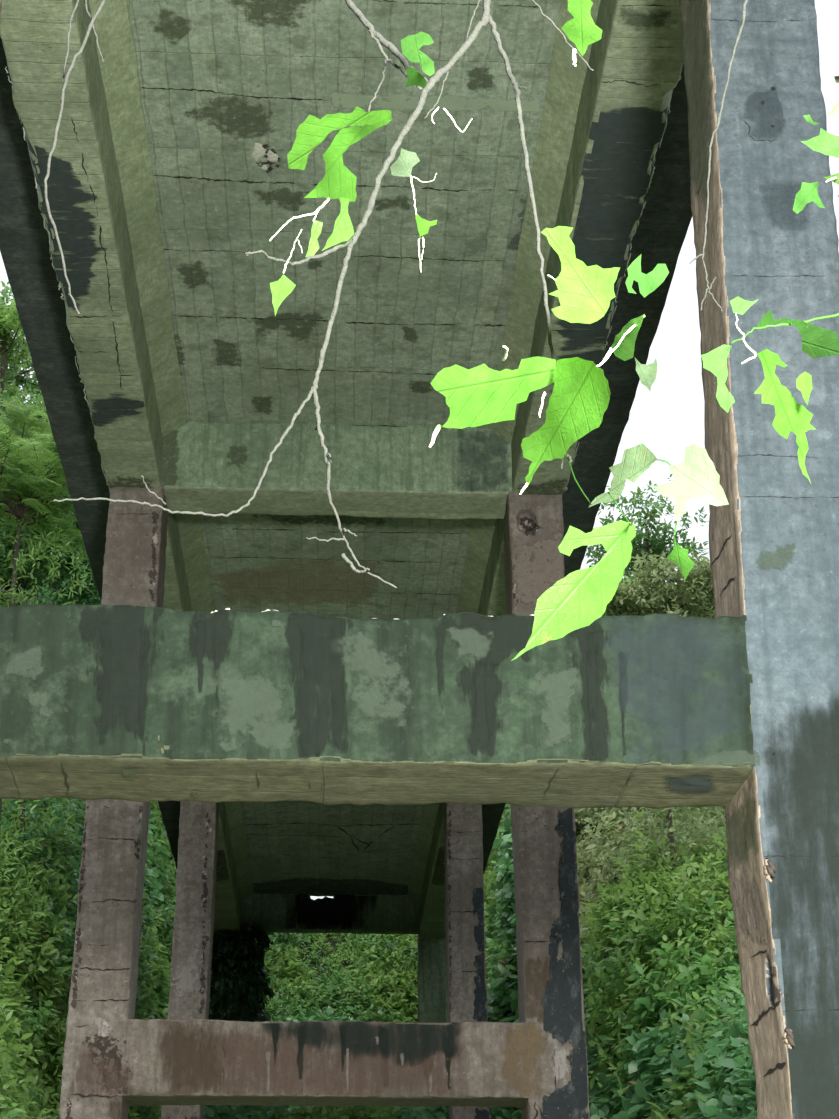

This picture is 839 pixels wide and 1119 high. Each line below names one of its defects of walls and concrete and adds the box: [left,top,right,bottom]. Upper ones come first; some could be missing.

leakage [186,97,273,138]
spalling [252,142,281,173]
peeling [512,516,564,616]
leakage [80,605,164,753]
leakage [190,560,376,758]
leakage [525,935,559,1022]
leakage [268,1029,279,1085]
leakage [297,1026,305,1079]
leakage [445,1051,453,1089]
crack [534,1052,556,1119]
leakage [552,1034,569,1080]